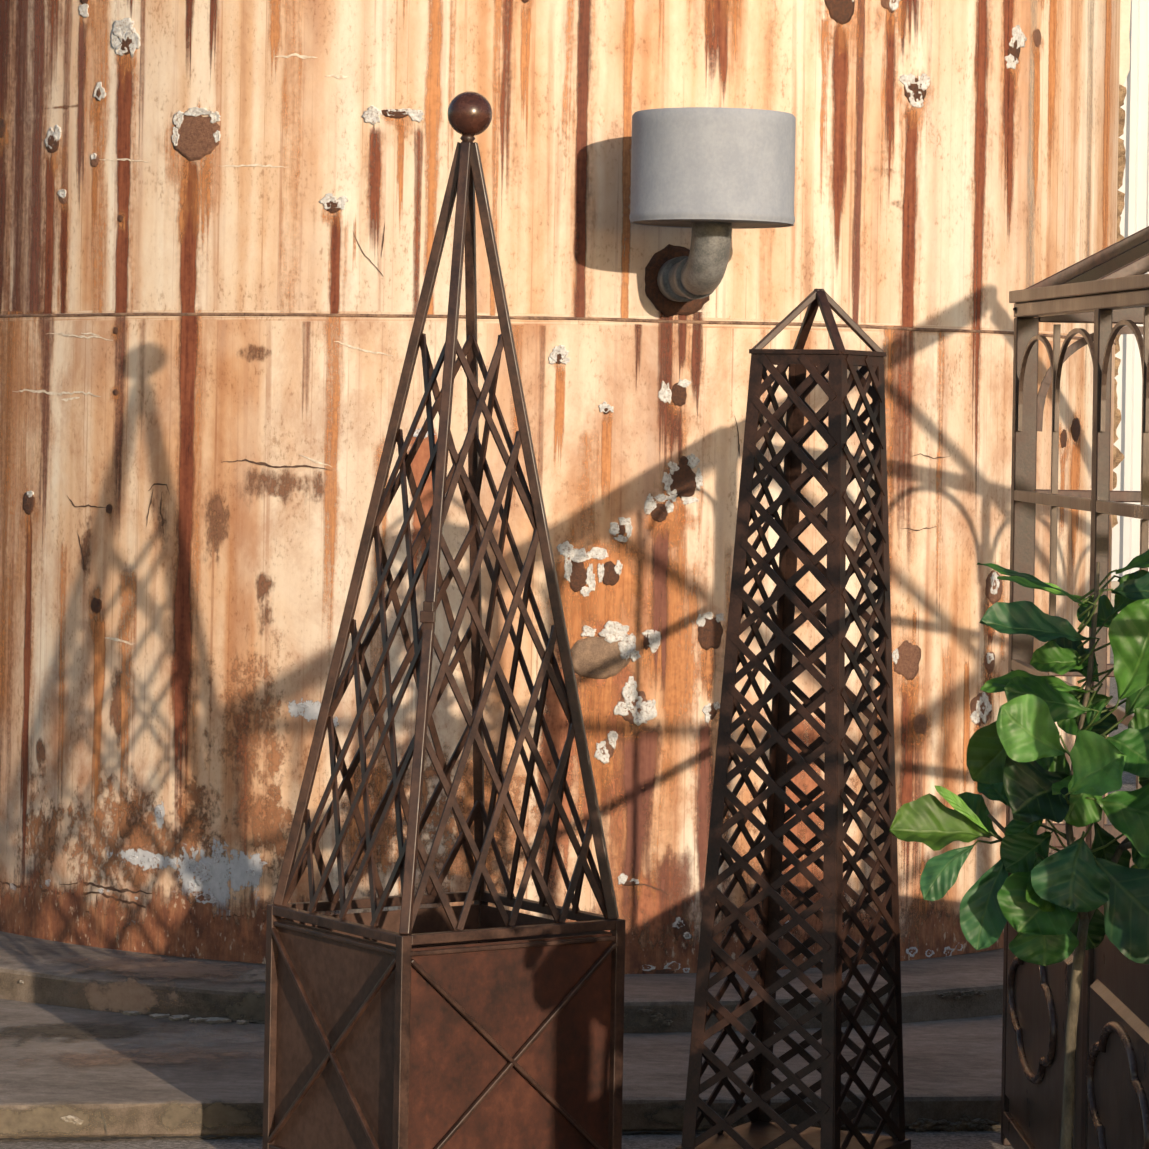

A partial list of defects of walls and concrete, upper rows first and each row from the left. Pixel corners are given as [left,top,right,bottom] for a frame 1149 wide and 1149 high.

peeling [706,0,740,93]
corrosion [820,0,865,324]
peeling [881,0,931,327]
corrosion [0,0,292,1014]
peeling [105,837,268,916]
crack [221,459,332,471]
corrosion [343,435,763,974]
peeling [557,517,633,656]
peeling [594,676,663,914]
peeling [642,493,674,686]
corrosion [646,312,730,727]
corrosion [842,841,1004,965]